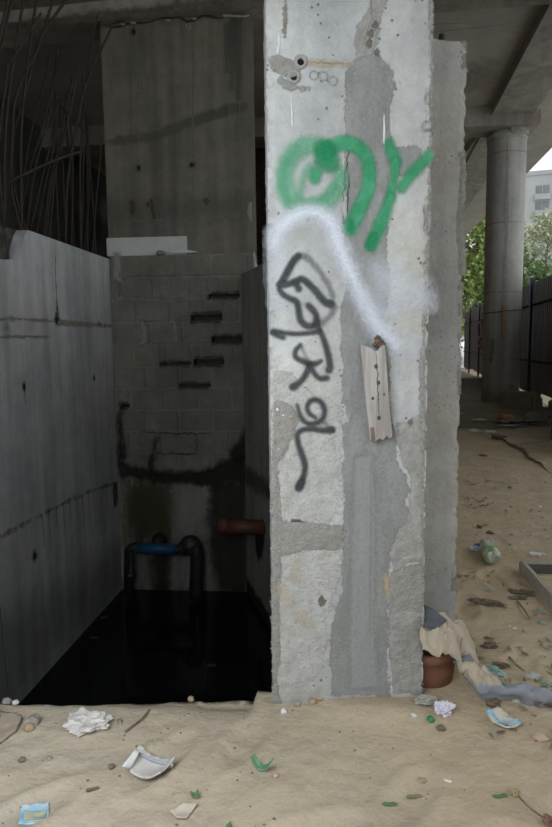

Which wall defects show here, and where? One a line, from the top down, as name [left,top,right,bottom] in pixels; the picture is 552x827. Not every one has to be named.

spalling [428,0,445,115]
peeling [269,20,432,704]
water stain [99,401,272,630]